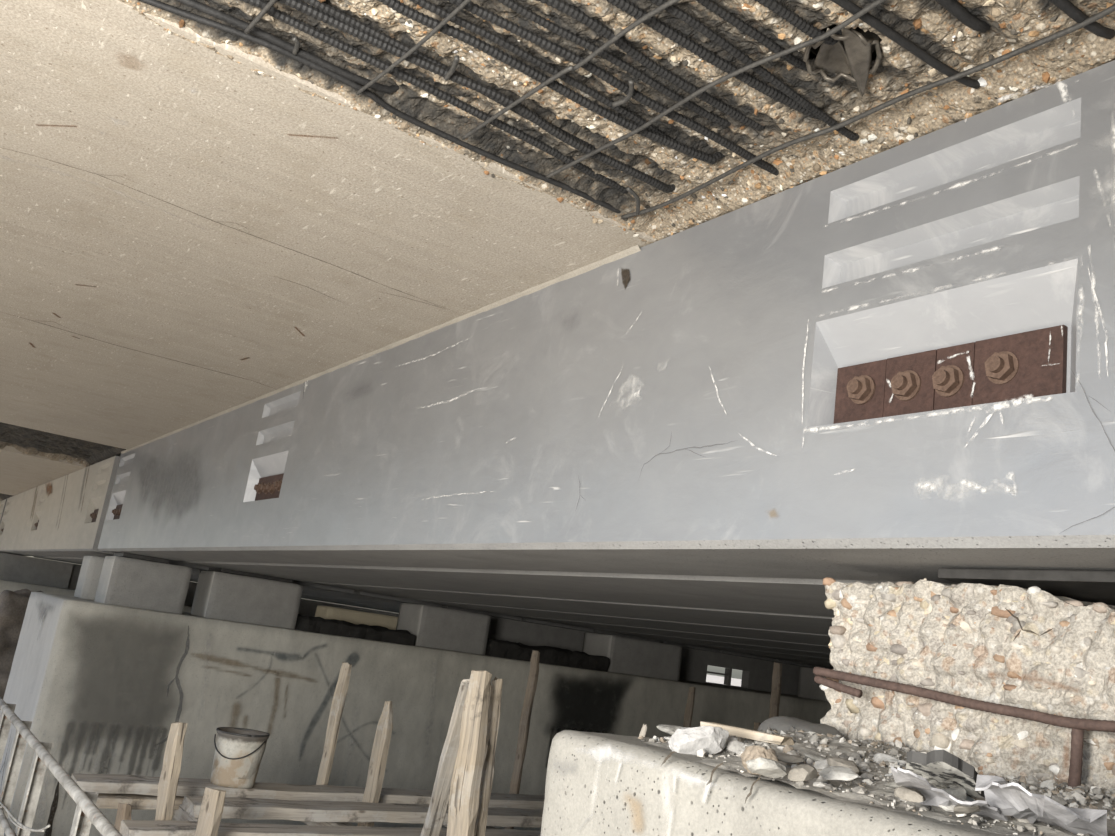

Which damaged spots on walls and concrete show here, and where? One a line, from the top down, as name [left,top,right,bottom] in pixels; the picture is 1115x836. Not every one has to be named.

spalling [118,0,1115,244]
crack [641,431,733,471]
crack [1070,368,1115,451]
crack [1005,608,1053,641]
leakage [59,623,178,776]
leakage [546,678,628,765]
rust [813,667,1115,788]